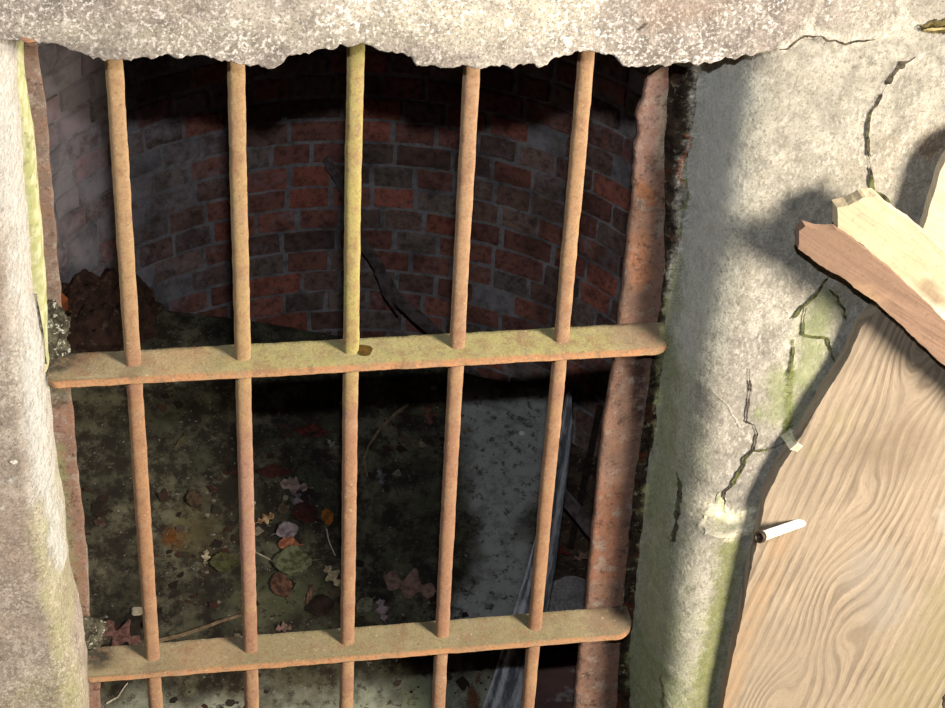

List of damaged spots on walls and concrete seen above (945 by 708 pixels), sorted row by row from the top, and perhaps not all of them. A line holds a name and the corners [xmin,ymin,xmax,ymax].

crack [778,0,921,52]
crack [866,53,923,203]
water stain [0,61,67,567]
rust [358,345,373,356]
crack [785,277,847,377]
crack [723,369,785,507]
crack [670,471,682,543]